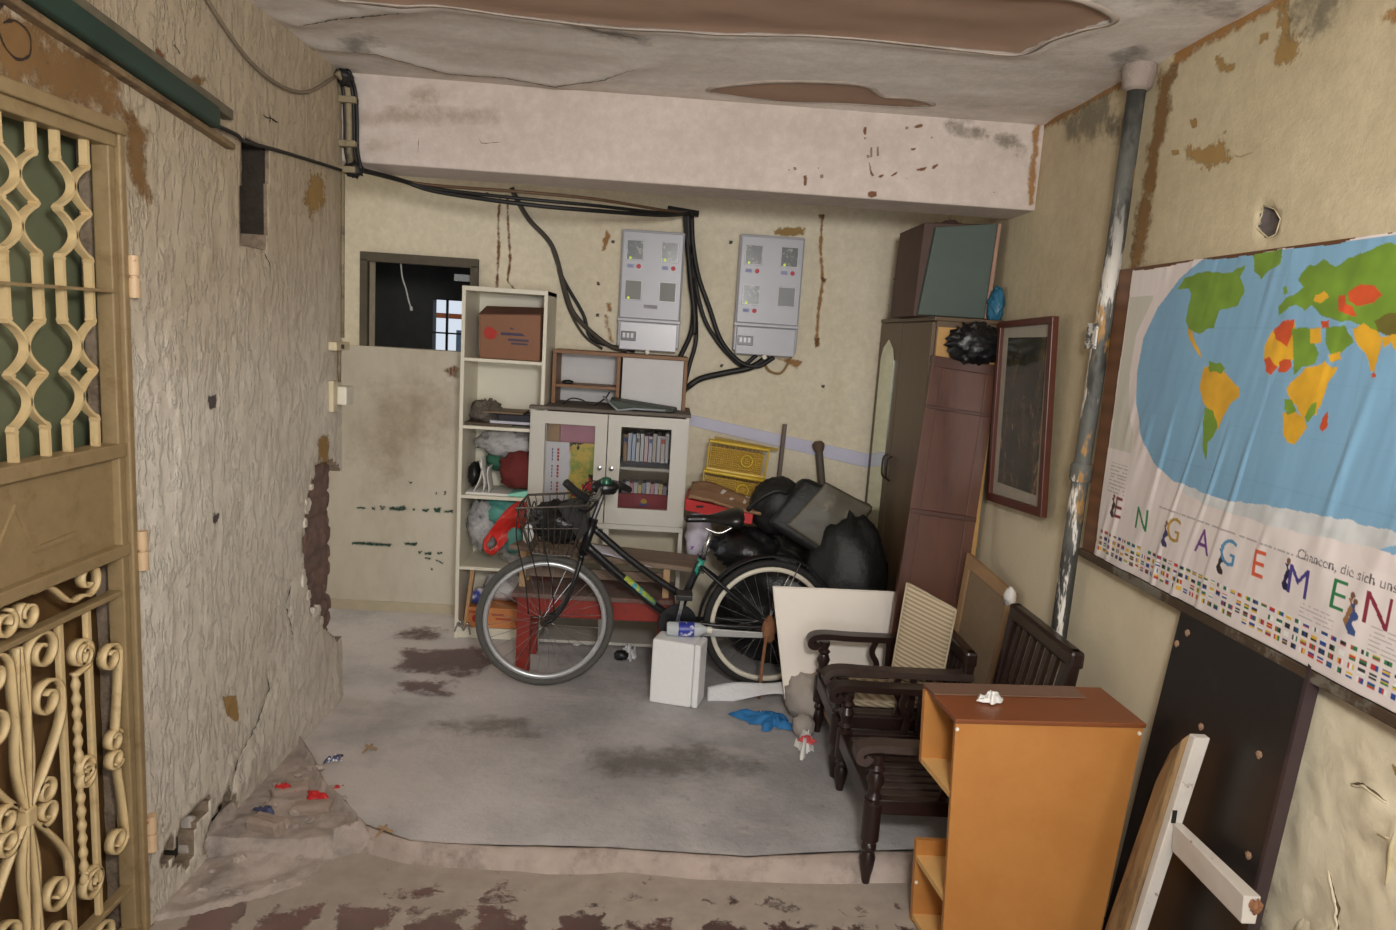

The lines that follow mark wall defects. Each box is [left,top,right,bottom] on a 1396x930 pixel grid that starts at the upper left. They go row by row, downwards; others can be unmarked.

peeling [1215,56,1234,73]
leakage [1172,0,1336,67]
corrosion [1028,125,1040,205]
peeling [1172,131,1268,170]
spalling [1255,205,1281,239]
corrosion [815,214,826,347]
spalling [301,436,331,630]
leakage [397,628,491,696]
crack [1350,782,1388,804]
crack [1327,870,1341,930]